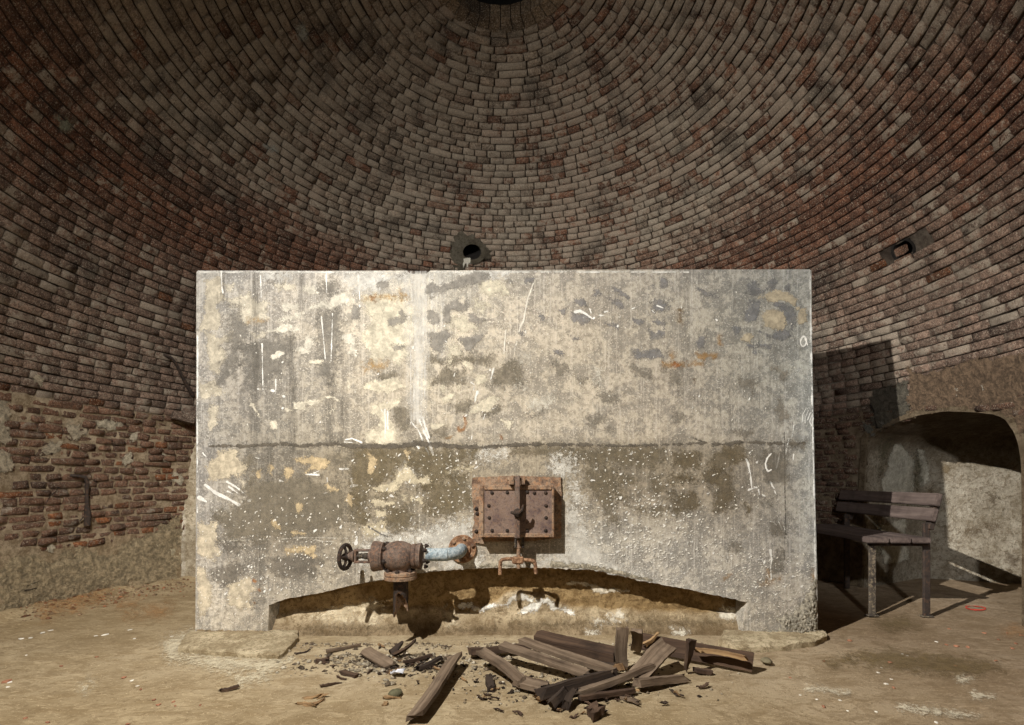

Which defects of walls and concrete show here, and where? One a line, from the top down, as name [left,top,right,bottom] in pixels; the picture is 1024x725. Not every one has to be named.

water stain [428,320,556,419]
water stain [551,361,620,403]
water stain [196,335,206,472]
peeling [0,449,14,473]
peeling [39,418,88,458]
peeling [122,431,140,468]
water stain [209,399,816,586]